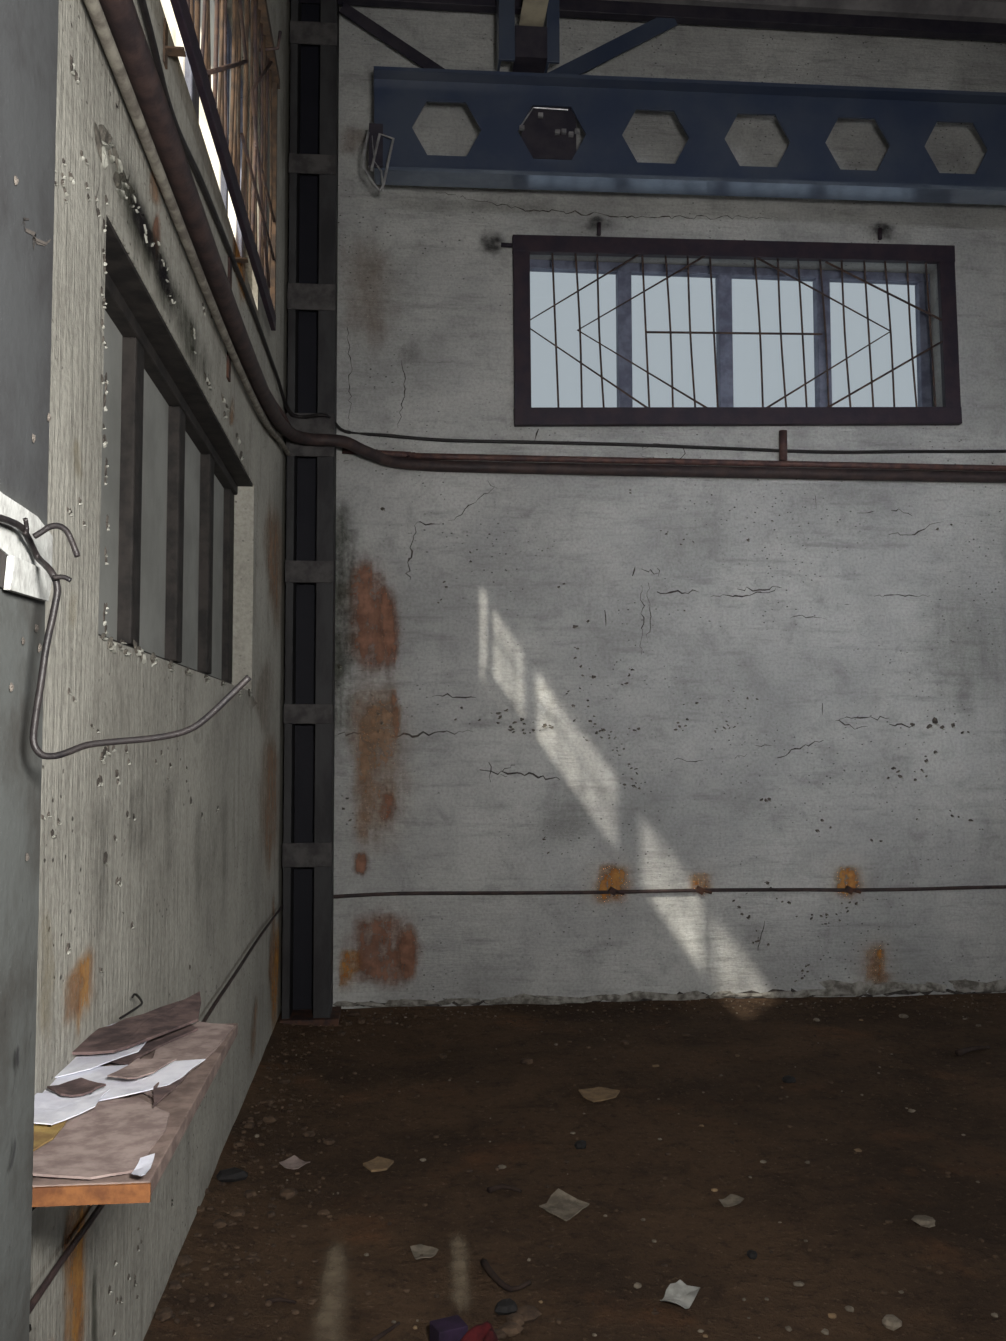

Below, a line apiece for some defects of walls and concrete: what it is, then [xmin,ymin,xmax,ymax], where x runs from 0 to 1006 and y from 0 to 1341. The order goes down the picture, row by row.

leakage [123,181,205,366]
crack [405,483,496,579]
corrosion [349,563,397,668]
crack [632,568,827,654]
crack [739,703,912,758]
crack [480,762,560,782]
corrosion [597,867,626,900]
corrosion [837,867,859,896]
corrosion [340,916,417,984]